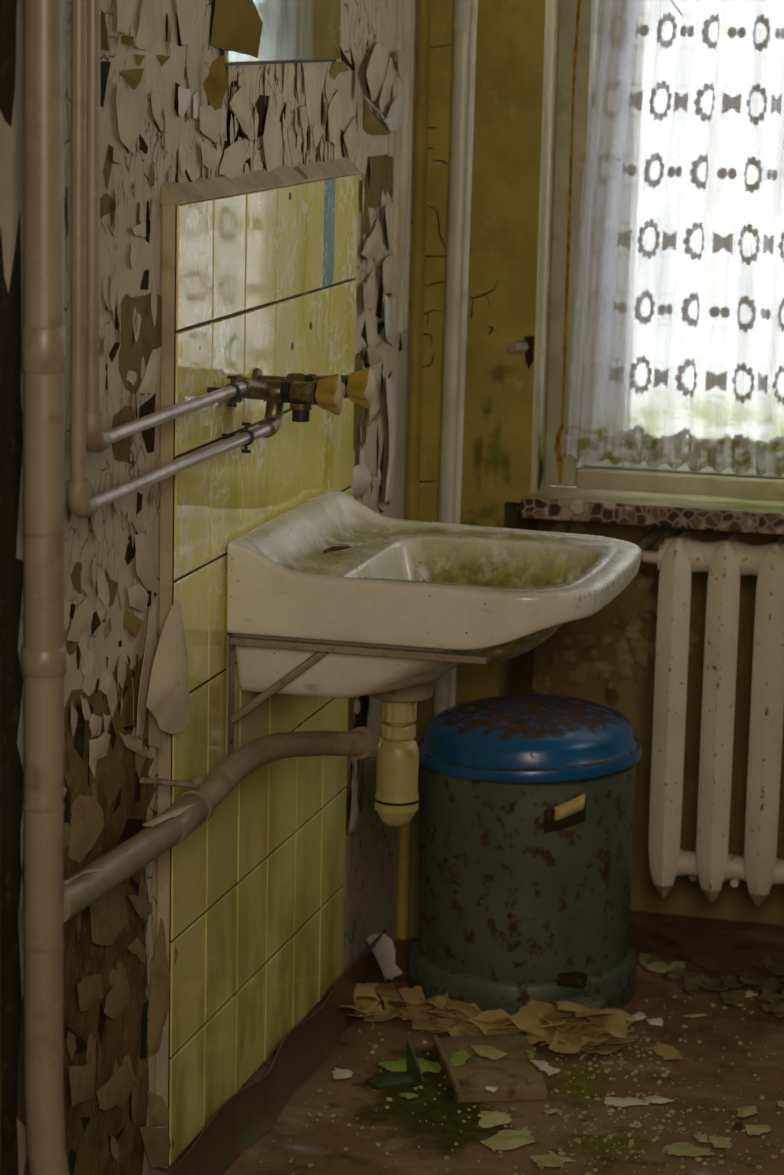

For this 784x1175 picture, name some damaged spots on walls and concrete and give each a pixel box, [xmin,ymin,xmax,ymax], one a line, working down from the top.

crack [423,205,447,368]
crack [470,279,499,336]
flaking render [64,0,407,884]
flaking render [63,867,178,1175]
water stain [361,1048,509,1154]